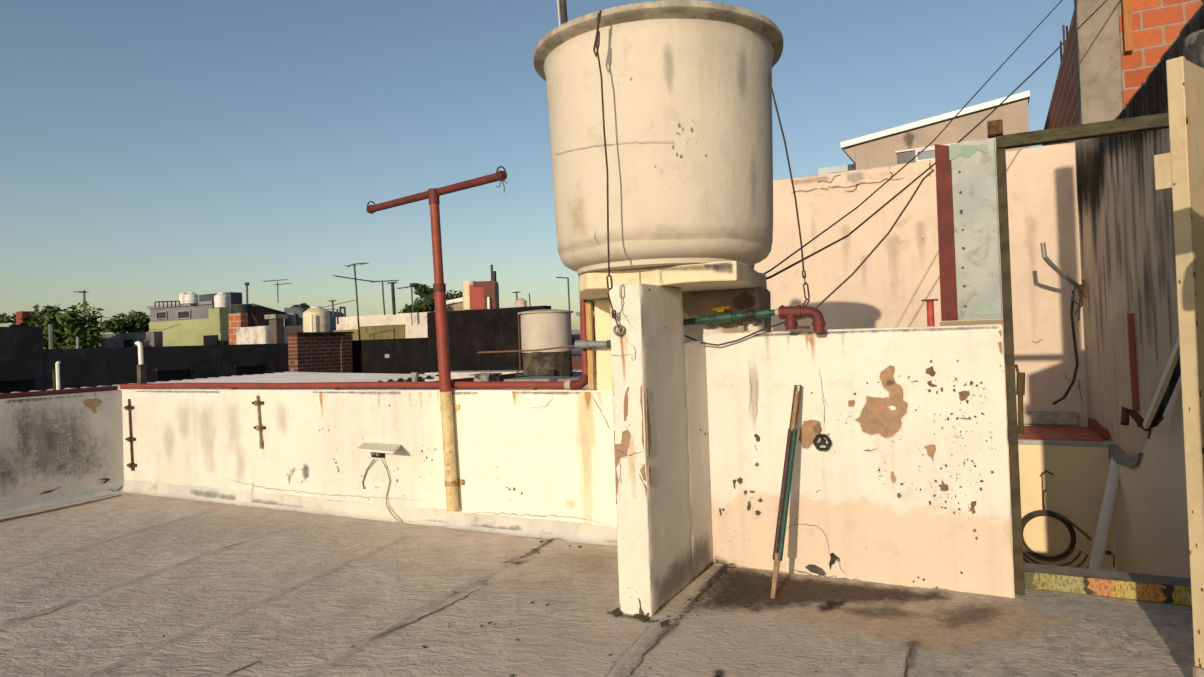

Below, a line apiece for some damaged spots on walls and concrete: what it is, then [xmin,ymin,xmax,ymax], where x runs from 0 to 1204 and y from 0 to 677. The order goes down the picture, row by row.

leakage [1115,5,1204,120]
leakage [1075,129,1160,251]
peeling [613,385,651,505]
peeling [797,418,829,450]
peeling [837,360,996,514]
crack [626,626,671,677]
crack [904,643,914,677]